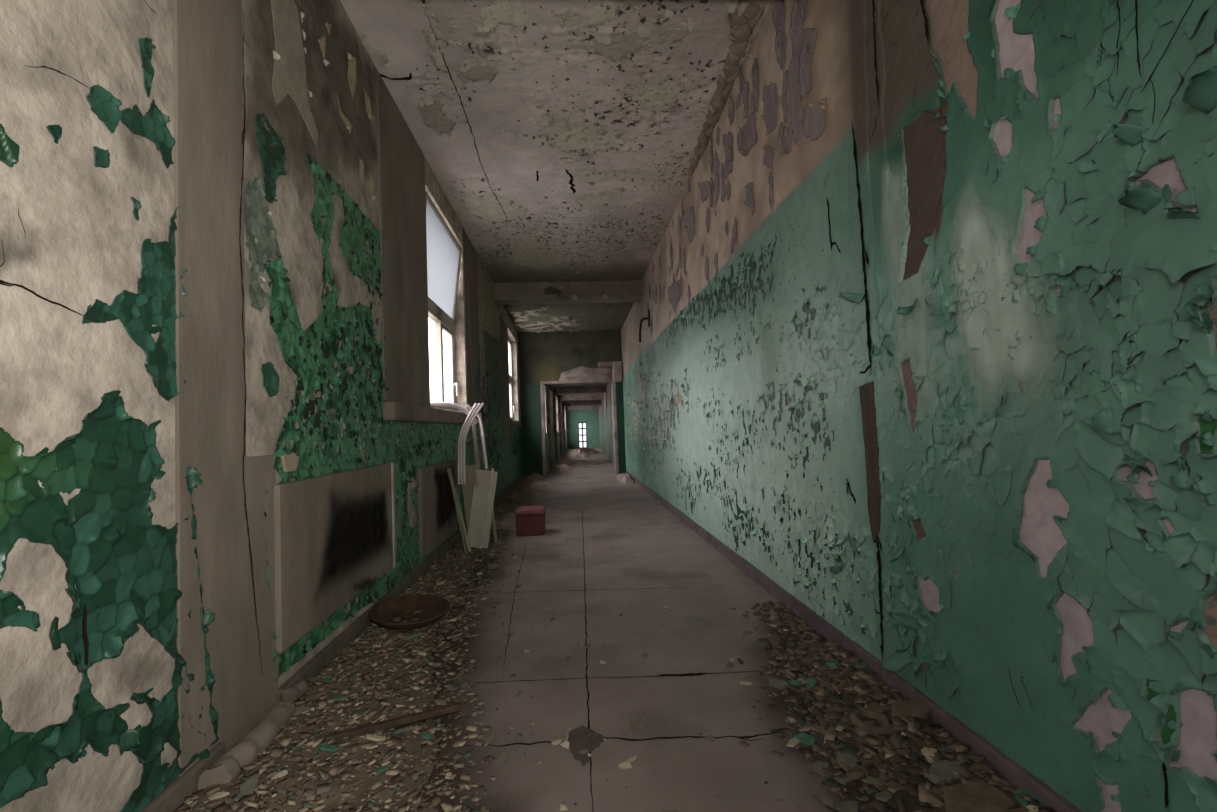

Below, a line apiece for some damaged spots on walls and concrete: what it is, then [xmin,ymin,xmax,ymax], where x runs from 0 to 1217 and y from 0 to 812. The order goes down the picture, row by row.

peeling [87,37,176,168]
crack [380,72,413,80]
crack [424,9,508,226]
peeling [896,0,1013,281]
crack [0,208,84,316]
peeling [83,207,187,401]
peeling [240,0,523,682]
spalling [625,362,865,635]
peeling [0,390,219,812]
crack [657,670,708,678]
crack [606,727,798,741]
crack [874,536,883,661]